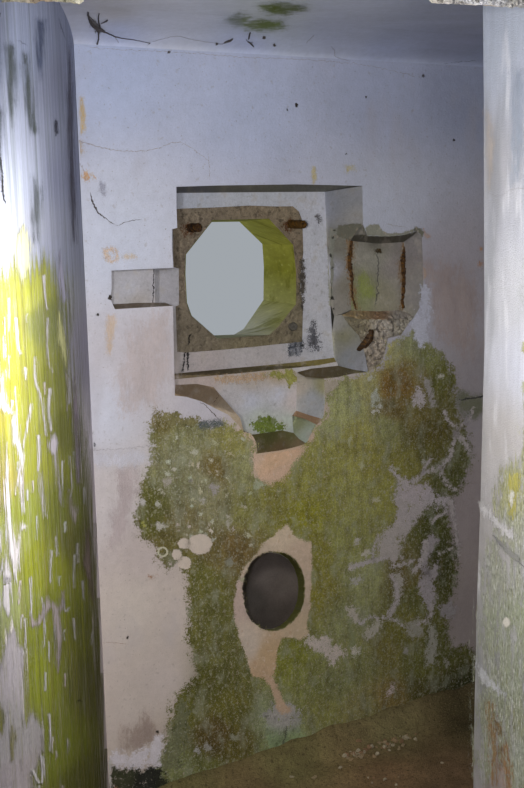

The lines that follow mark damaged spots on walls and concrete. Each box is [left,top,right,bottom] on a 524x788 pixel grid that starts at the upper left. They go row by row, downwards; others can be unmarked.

peeling [429,0,524,8]
crack [90,192,141,226]
flaking render [327,223,431,310]
mould [288,320,324,358]
leakage [104,299,225,434]
leakage [348,407,476,629]
leakage [478,499,517,542]
efflorescence [301,632,362,669]
leakage [475,659,505,697]